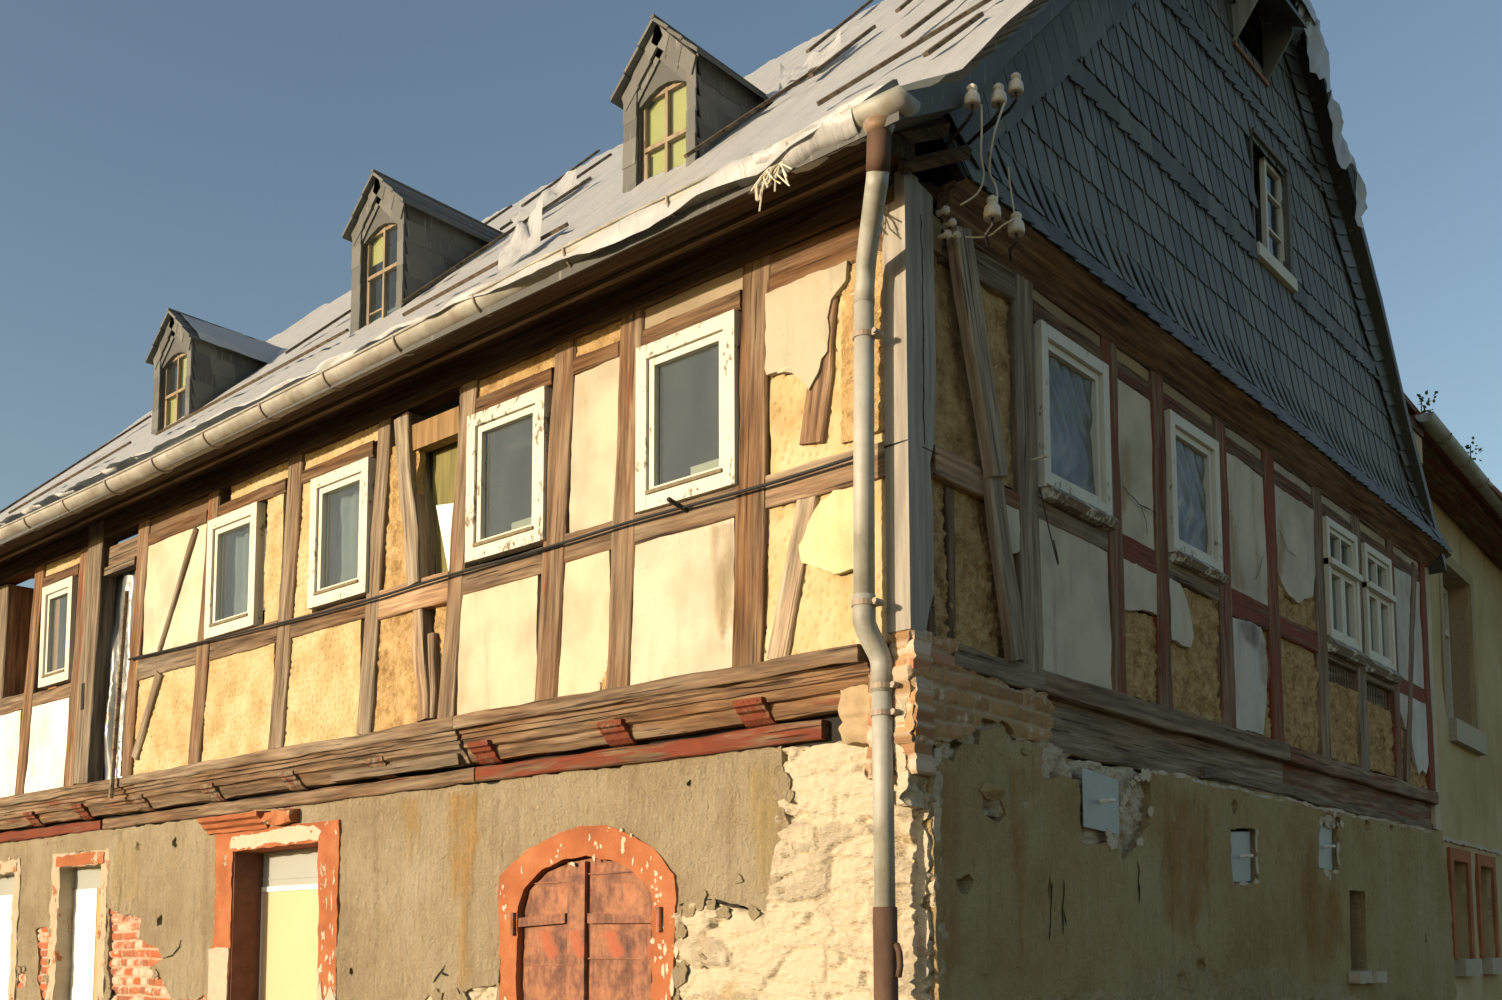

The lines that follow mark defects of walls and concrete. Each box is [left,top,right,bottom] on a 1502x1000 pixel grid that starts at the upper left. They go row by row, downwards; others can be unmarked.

flaking render [838,672,872,780]
flaking render [889,627,1431,886]
flaking render [9,894,56,1000]
flaking render [96,885,230,1000]